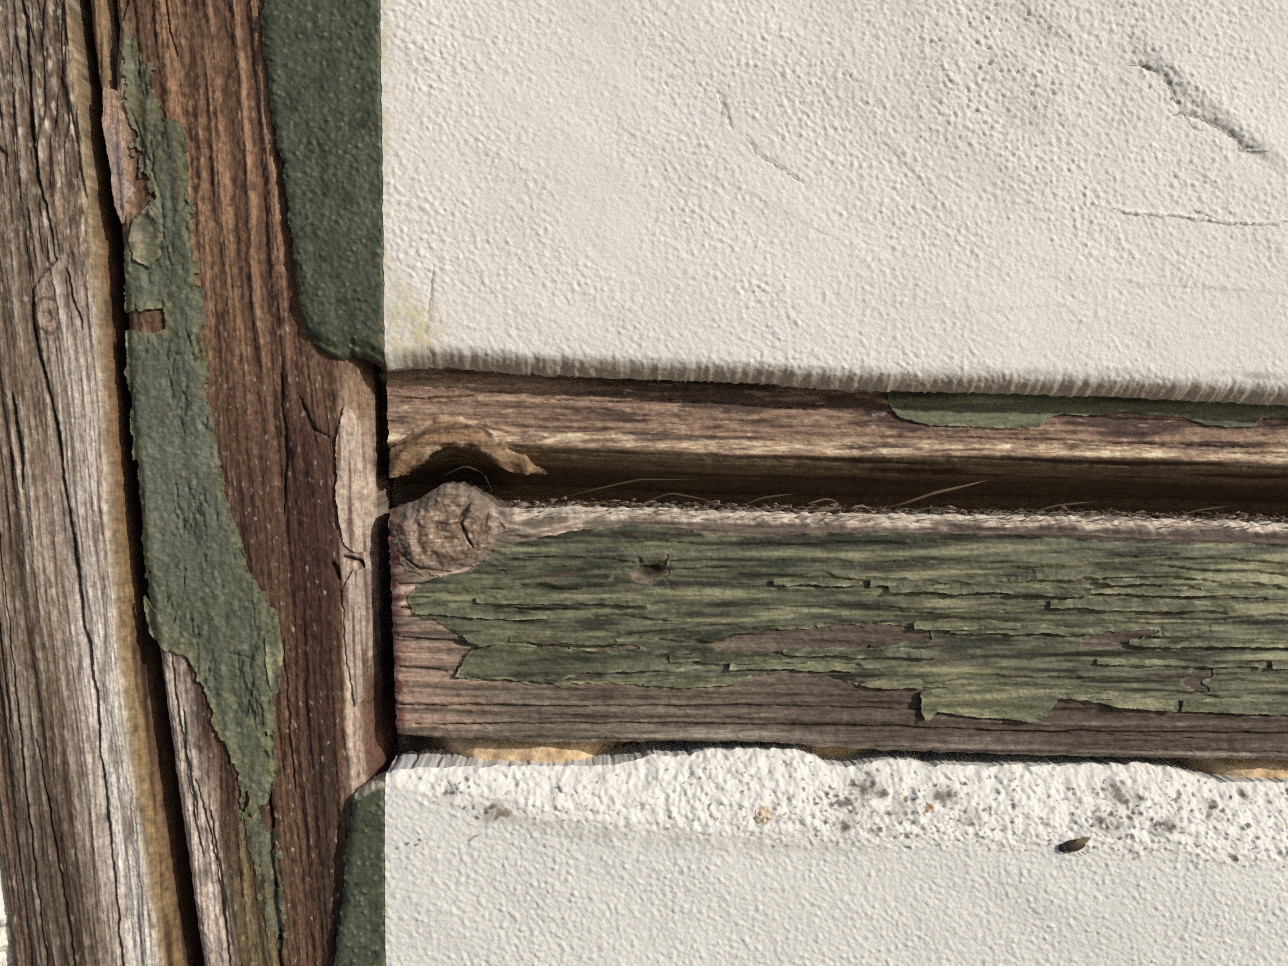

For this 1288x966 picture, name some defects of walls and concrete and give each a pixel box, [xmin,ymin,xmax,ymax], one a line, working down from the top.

crack [1128,65,1271,152]
peeling [118,32,288,951]
peeling [407,524,1288,723]
flaking render [0,897,14,966]